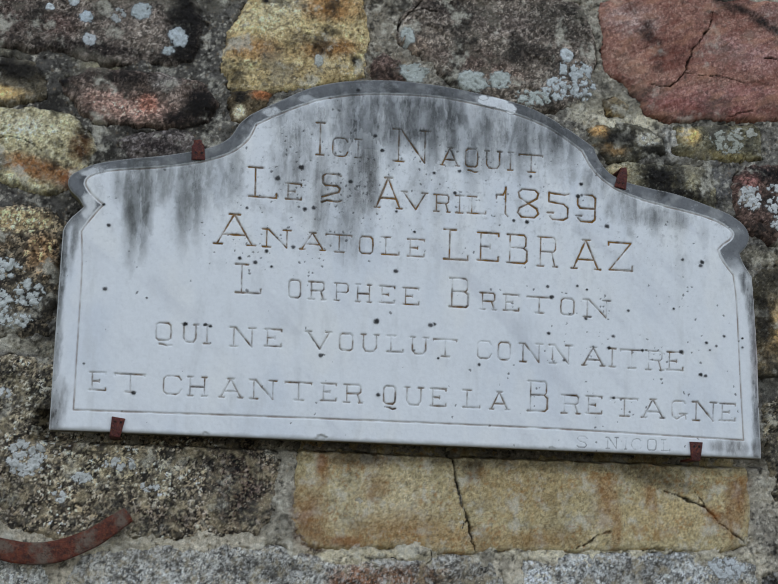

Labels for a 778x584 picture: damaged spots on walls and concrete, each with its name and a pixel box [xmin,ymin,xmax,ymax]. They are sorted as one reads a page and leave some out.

crack [669,20,744,87]
damp [69,172,88,199]
damp [90,81,479,232]
damp [511,103,749,262]
crack [446,455,473,544]
crack [678,496,737,537]